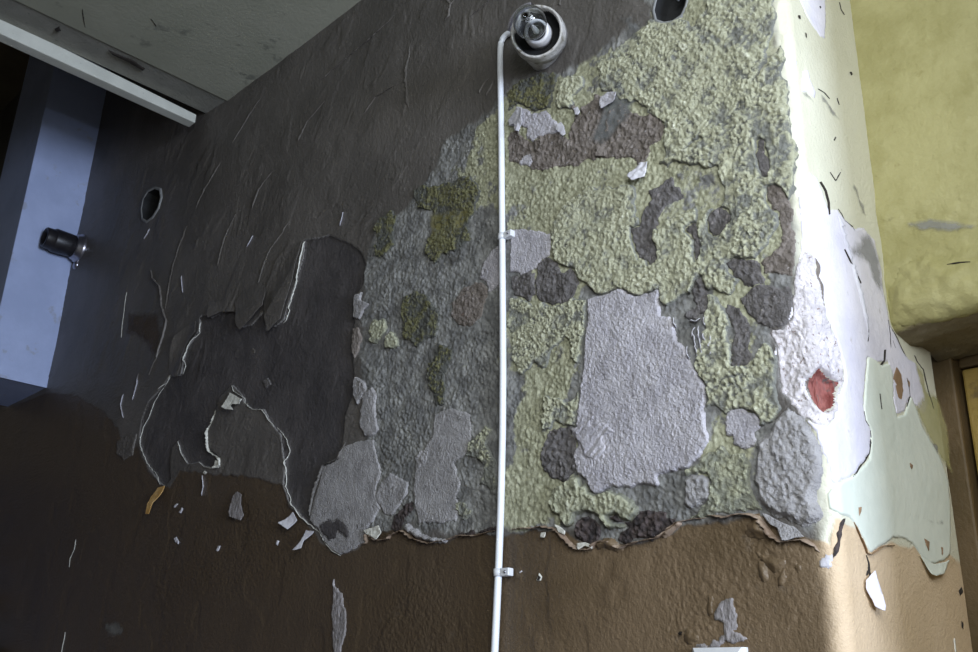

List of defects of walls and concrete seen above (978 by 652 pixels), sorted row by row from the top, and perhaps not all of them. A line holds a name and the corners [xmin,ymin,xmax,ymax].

spalling [508,91,665,180]
spalling [631,177,684,265]
spalling [686,207,731,260]
spalling [511,257,580,306]
crack [149,270,167,374]
peeling [725,138,925,483]
peeling [139,236,366,556]
spalling [540,426,577,483]
spalling [364,501,414,539]
spalling [540,516,601,550]
spalling [610,510,676,544]
peeling [762,513,804,541]